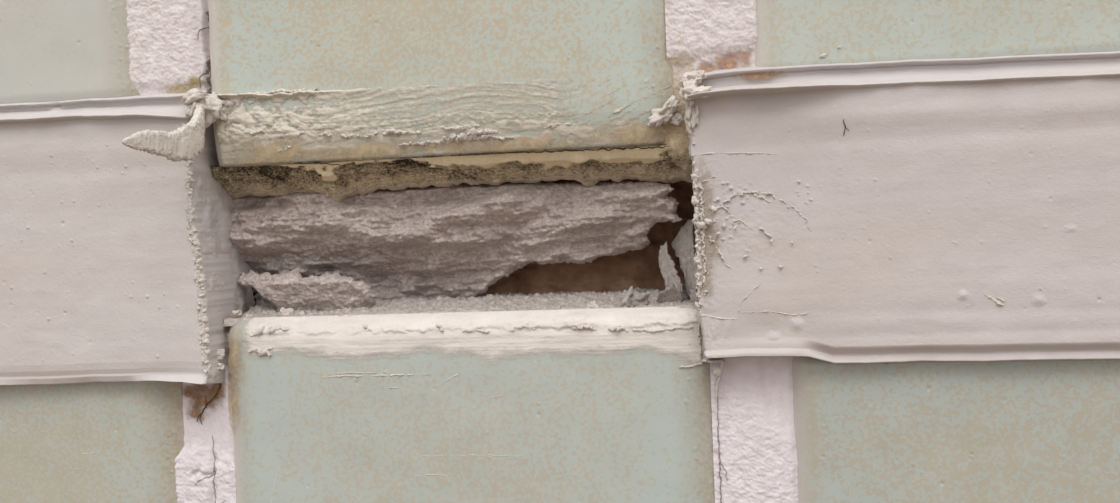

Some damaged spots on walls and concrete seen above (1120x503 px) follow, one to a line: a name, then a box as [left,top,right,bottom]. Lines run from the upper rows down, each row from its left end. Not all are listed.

peeling [248,88,316,98]
peeling [319,124,514,148]